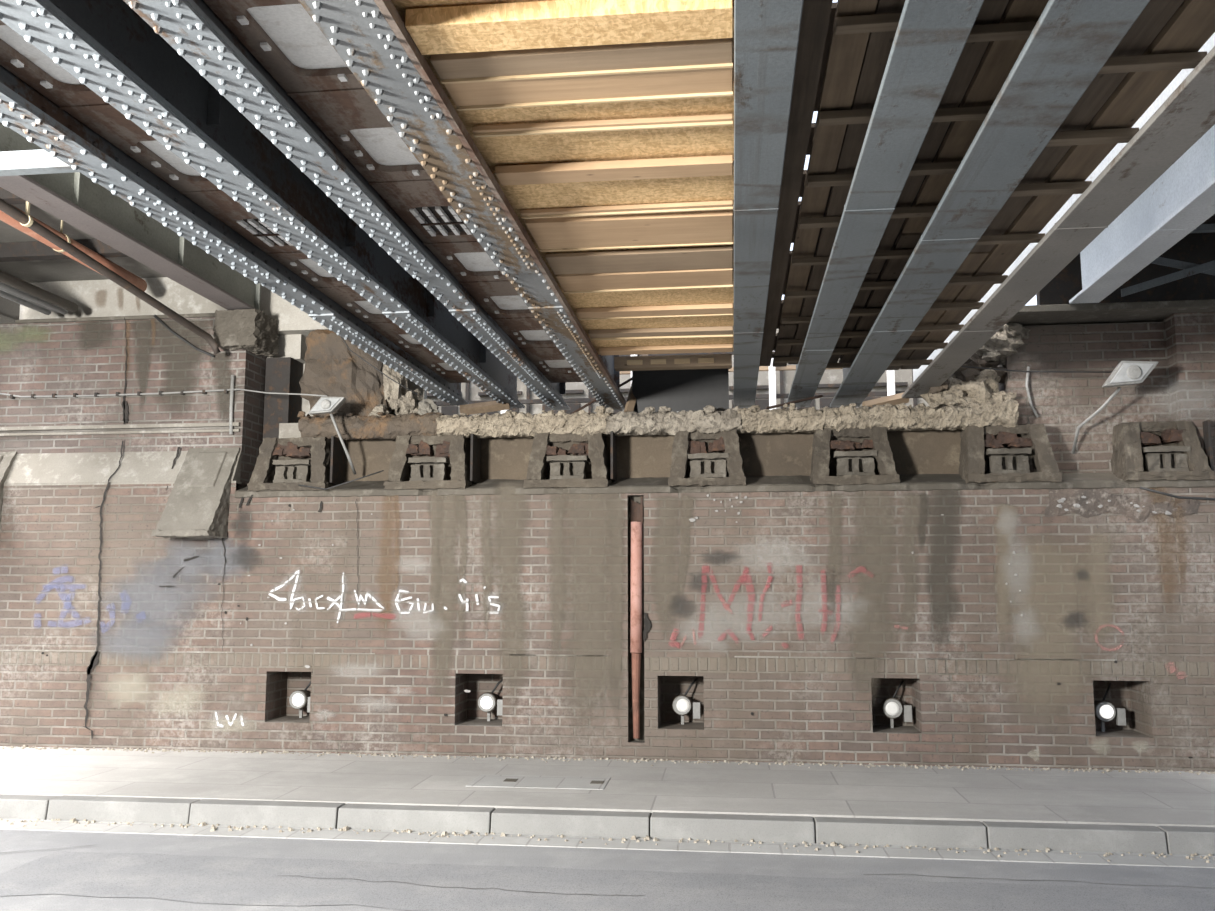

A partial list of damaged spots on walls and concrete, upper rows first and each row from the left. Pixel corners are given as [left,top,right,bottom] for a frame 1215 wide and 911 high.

spalling [297,322,1030,440]
crack [83,318,129,739]
water stain [854,489,958,673]
water stain [998,505,1110,702]
spalling [1045,488,1200,523]